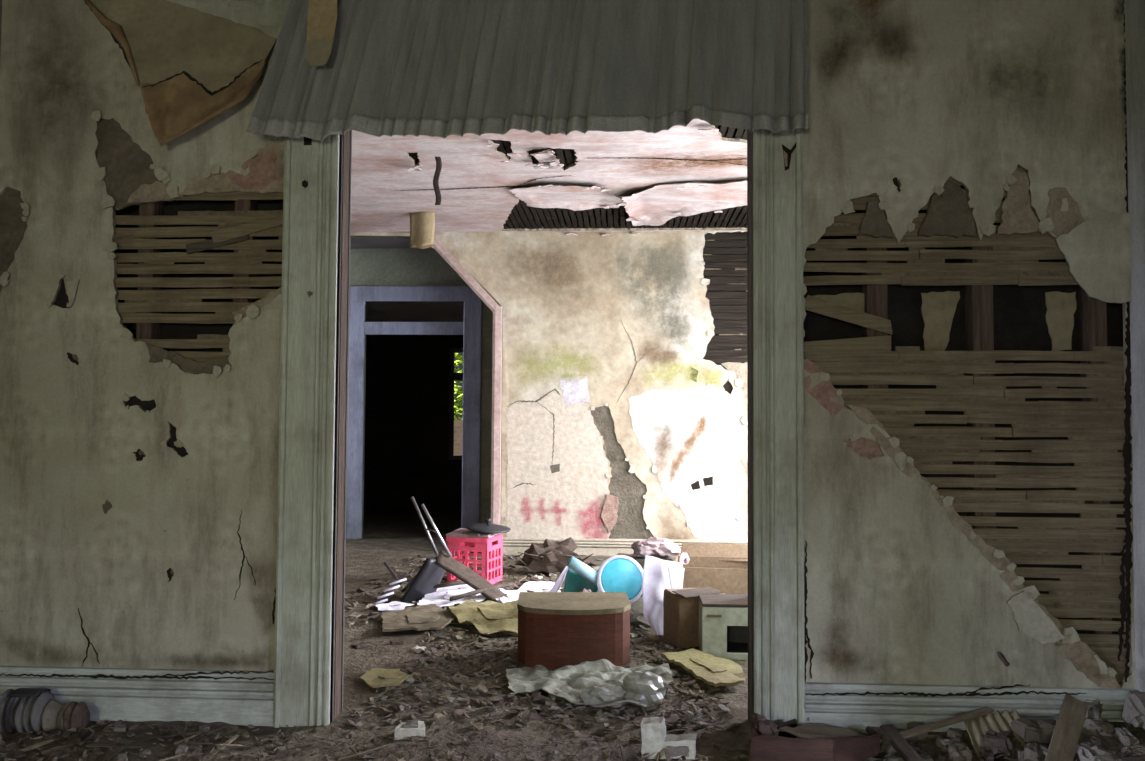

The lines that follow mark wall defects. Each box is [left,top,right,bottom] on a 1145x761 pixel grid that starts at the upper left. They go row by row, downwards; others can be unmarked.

flaking render [0,187,30,292]
flaking render [90,111,284,378]
peeling [408,153,442,249]
flaking render [487,140,576,169]
flaking render [698,125,747,140]
spalling [122,393,156,413]
spalling [161,423,188,457]
peeling [503,200,748,540]
flaking render [803,167,1132,689]
crack [235,509,276,624]
crack [0,608,274,680]